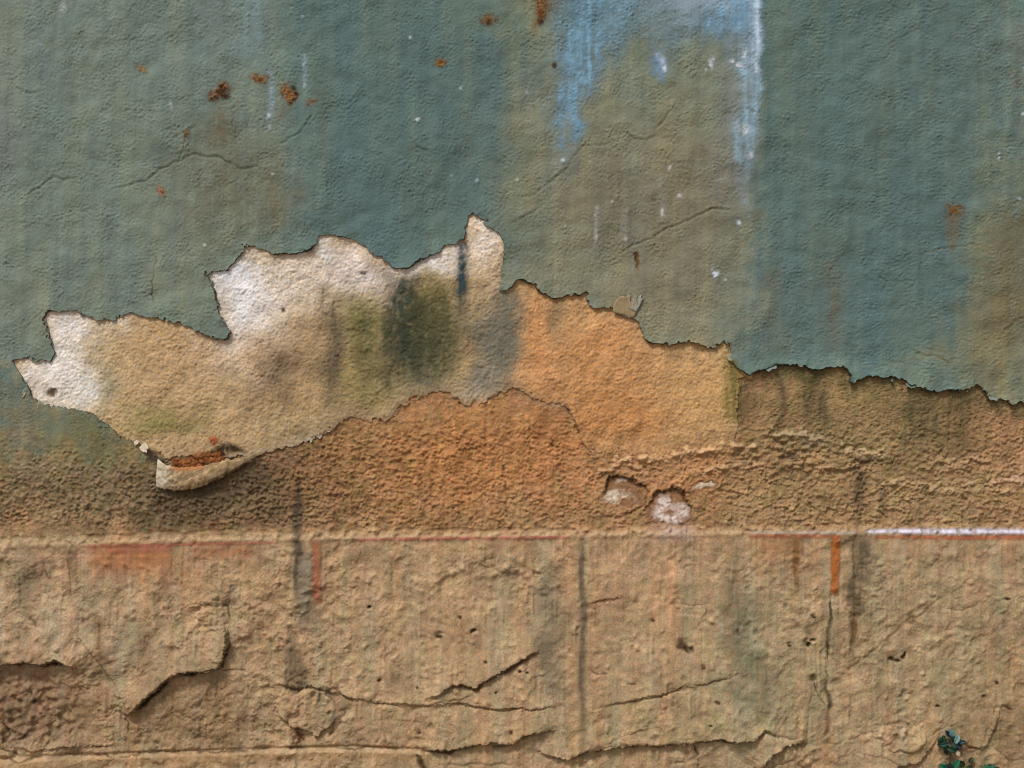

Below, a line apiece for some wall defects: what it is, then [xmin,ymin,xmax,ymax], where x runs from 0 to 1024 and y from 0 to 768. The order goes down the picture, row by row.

corrosion [534,0,551,25]
corrosion [208,81,230,100]
corrosion [281,84,315,105]
leakage [382,244,467,368]
flaking render [0,213,1024,768]
crack [814,595,915,708]
crack [127,645,243,729]
crack [435,654,534,704]
crack [2,724,33,763]
crack [417,745,478,768]